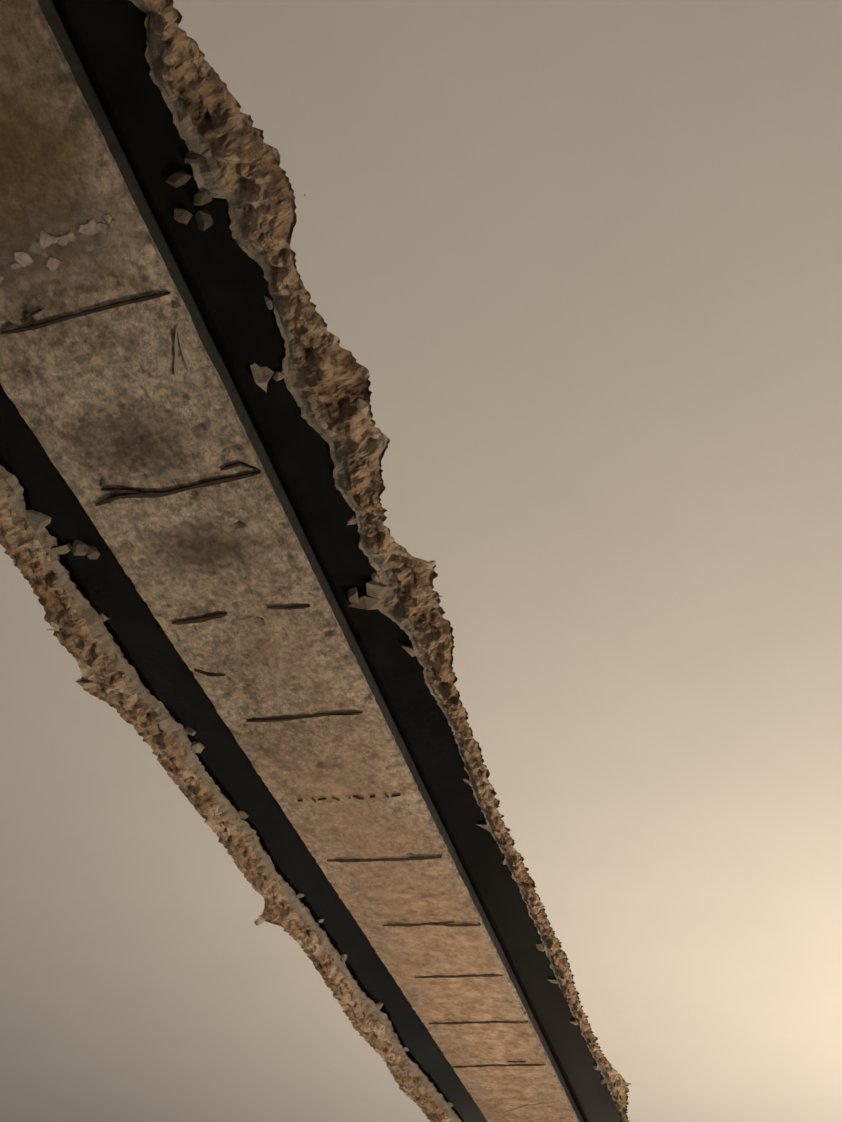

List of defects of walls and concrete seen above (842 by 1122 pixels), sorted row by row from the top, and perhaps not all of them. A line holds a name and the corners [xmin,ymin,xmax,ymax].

spalling [0,210,116,283]
crack [0,292,171,335]
crack [95,462,261,506]
flaking render [130,0,632,1122]
crack [172,612,227,625]
crack [246,710,363,722]
flaking render [0,465,464,1122]
crack [327,855,442,863]
crack [383,919,481,927]
crack [415,971,503,979]
crack [429,1018,528,1026]
crack [451,1060,546,1068]